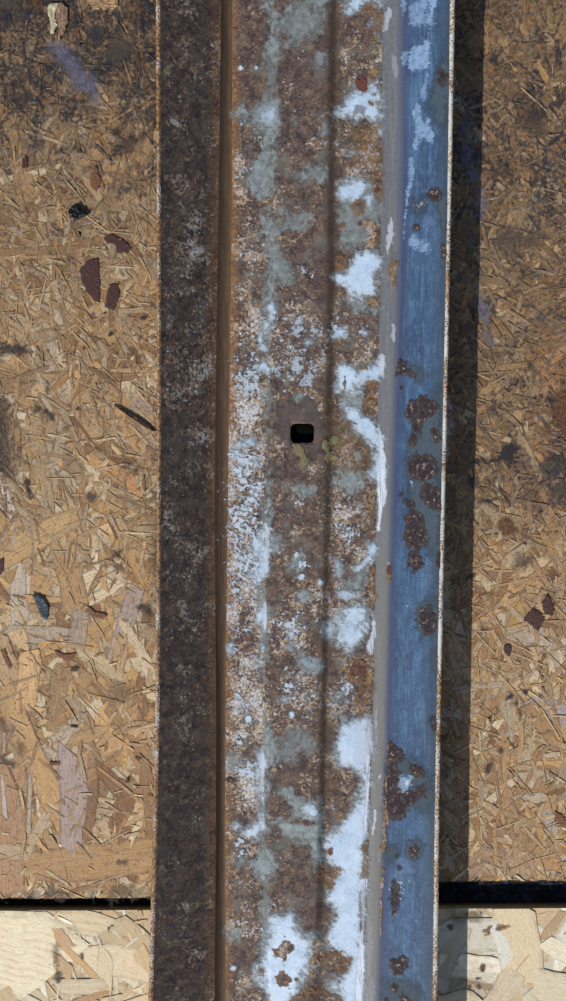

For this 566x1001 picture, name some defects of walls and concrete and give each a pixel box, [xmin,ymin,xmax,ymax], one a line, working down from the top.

rust [362,0,383,43]
rust [355,65,377,106]
rust [350,123,384,249]
rust [358,365,378,414]
rust [394,359,425,390]
rust [399,386,449,575]
rust [414,597,443,672]
rust [345,655,376,716]
rust [379,741,435,935]
rust [317,848,341,890]
rust [258,936,353,1001]
rust [384,955,421,1001]